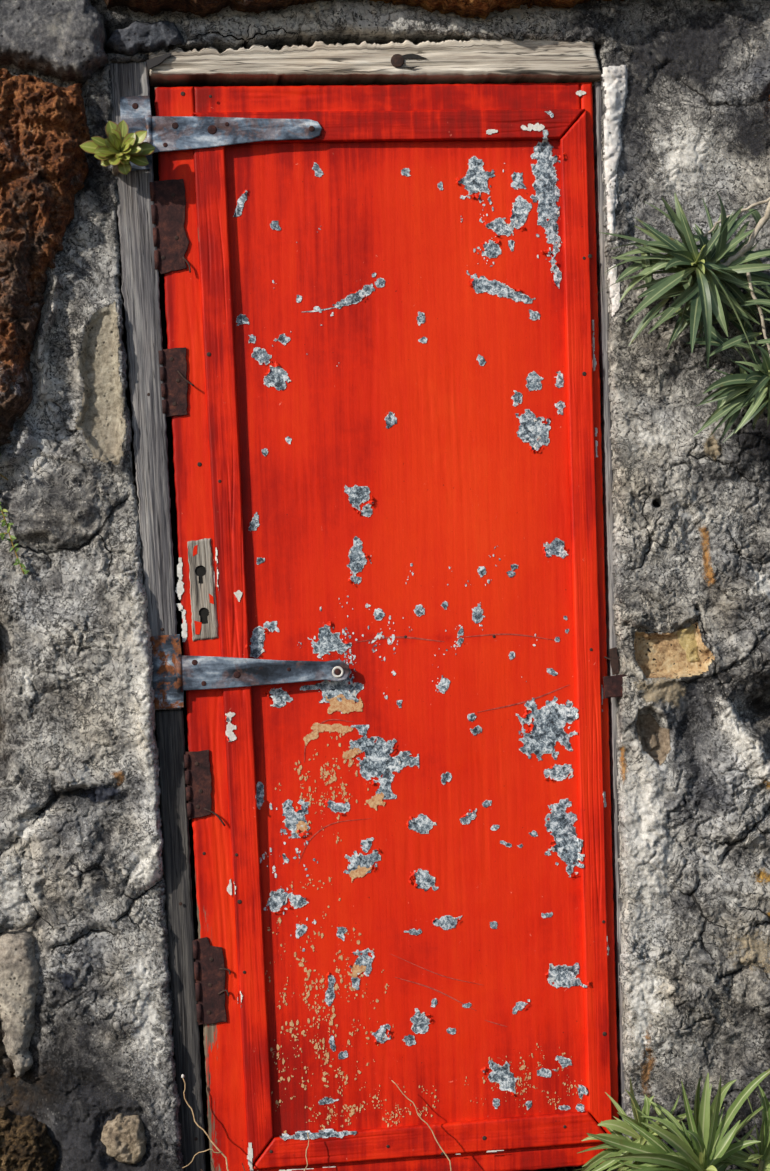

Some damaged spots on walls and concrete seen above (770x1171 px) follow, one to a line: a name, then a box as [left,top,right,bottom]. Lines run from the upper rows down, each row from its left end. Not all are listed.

peeling [438,156,495,200]
peeling [482,111,565,287]
peeling [511,371,565,453]
peeling [263,672,419,811]
peeling [516,696,579,781]
crack [0,777,162,956]
peeling [343,837,381,882]
peeling [490,798,585,879]
crack [719,806,770,861]
peeling [324,927,375,1006]
crack [680,879,770,988]
peeling [372,998,437,1046]